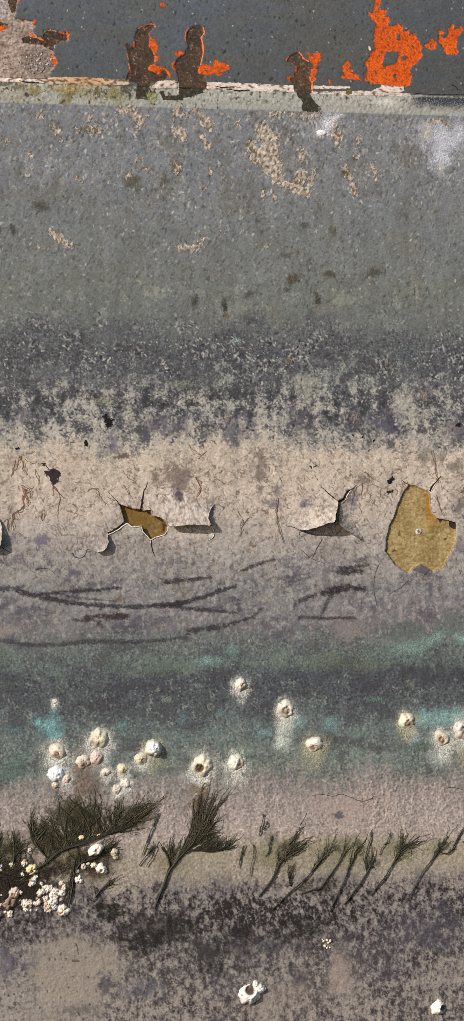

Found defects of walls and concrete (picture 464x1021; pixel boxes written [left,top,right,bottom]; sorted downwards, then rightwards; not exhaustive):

spalling [0,0,130,86]
peeling [152,80,191,89]
corrosion [124,23,229,100]
peeling [207,82,294,92]
corrosion [286,52,323,112]
flaking render [92,530,109,552]
flaking render [143,495,214,526]
flaking render [286,485,363,541]